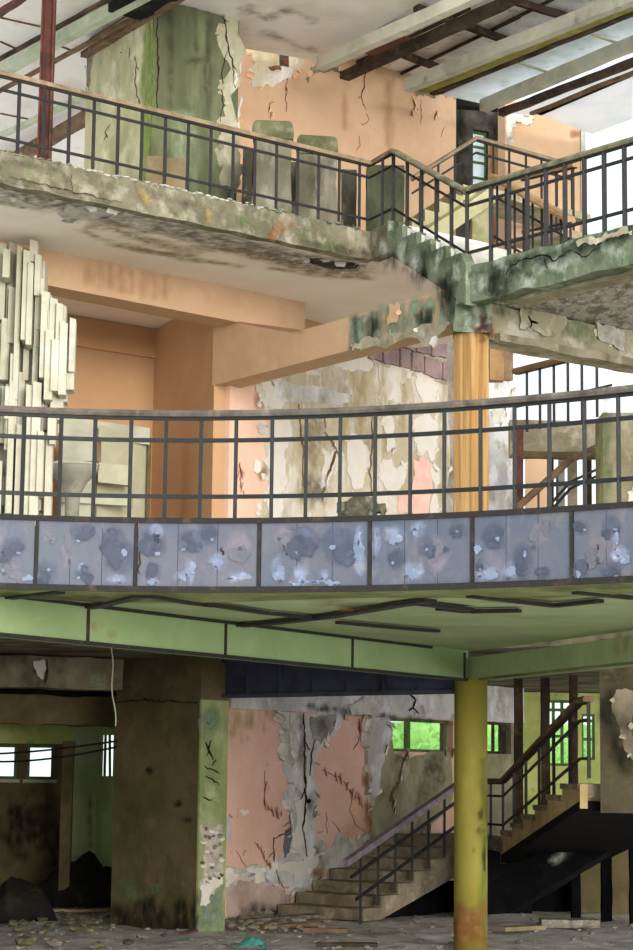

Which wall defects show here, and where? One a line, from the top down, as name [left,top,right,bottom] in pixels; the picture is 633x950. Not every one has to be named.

crack [120,17,160,108]
crack [220,17,238,122]
flaking render [0,16,361,231]
water stain [90,213,368,279]
spalling [300,256,365,272]
crack [505,249,595,275]
peeling [520,308,567,337]
flaking render [253,302,462,586]
crack [114,698,220,801]
flaking render [610,688,633,760]
crack [236,712,366,892]
flaking render [199,697,454,922]